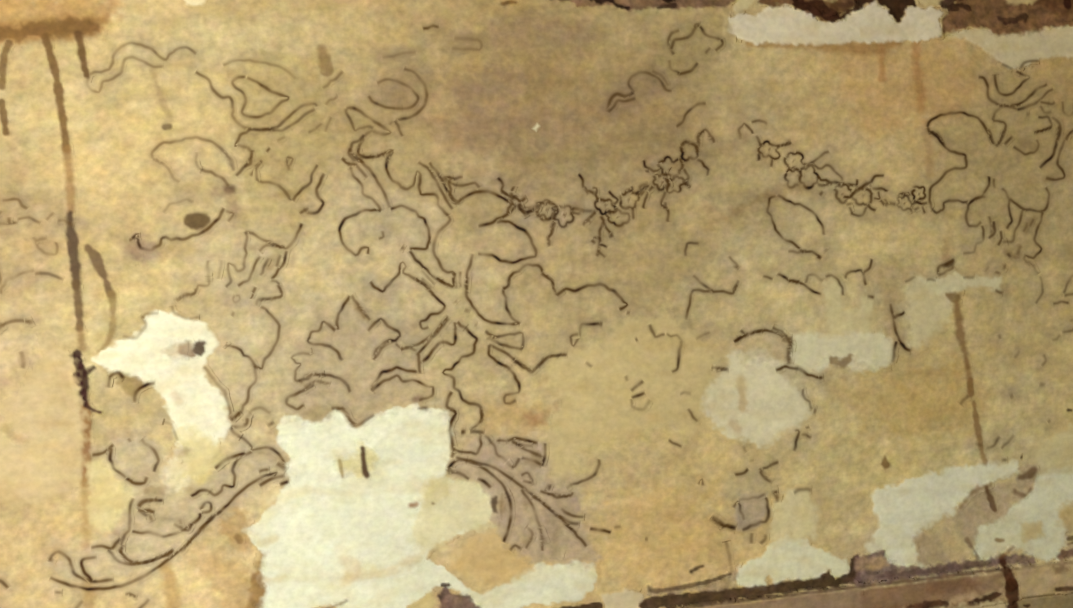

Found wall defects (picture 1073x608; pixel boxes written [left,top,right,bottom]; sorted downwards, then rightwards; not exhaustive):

peeling [546,0,1073,70]
damp [0,0,239,367]
damp [249,149,298,202]
damp [249,235,292,274]
peeling [0,307,232,534]
damp [113,369,147,404]
peeling [532,279,895,481]
damp [806,336,1003,472]
damp [79,583,99,608]
peeling [250,407,644,608]
peeling [736,486,849,586]
peeling [859,421,1073,565]